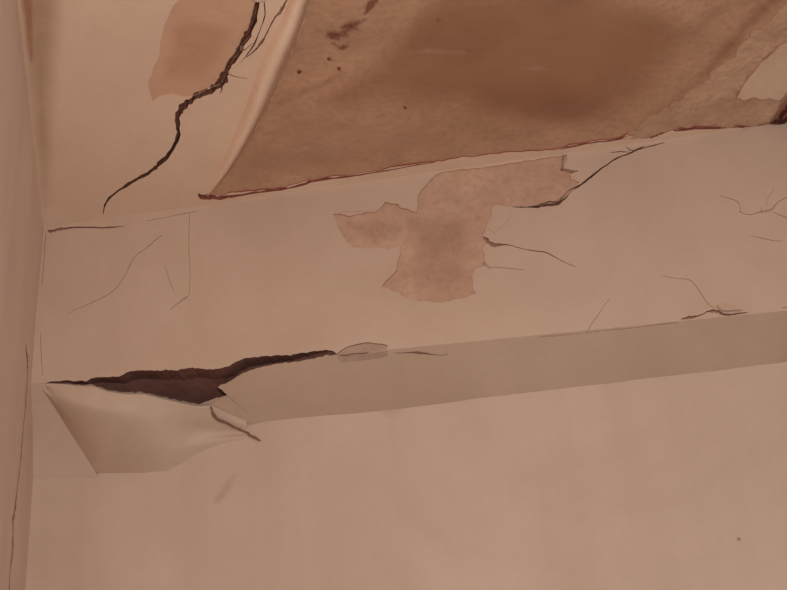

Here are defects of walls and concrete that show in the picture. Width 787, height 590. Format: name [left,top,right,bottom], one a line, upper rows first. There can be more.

peeling [148,0,266,101]
damp [388,2,670,106]
crack [42,0,287,284]
flaking render [206,0,787,303]
crack [483,236,575,270]
crack [719,189,787,218]
crack [538,276,747,338]
spalling [48,342,388,441]